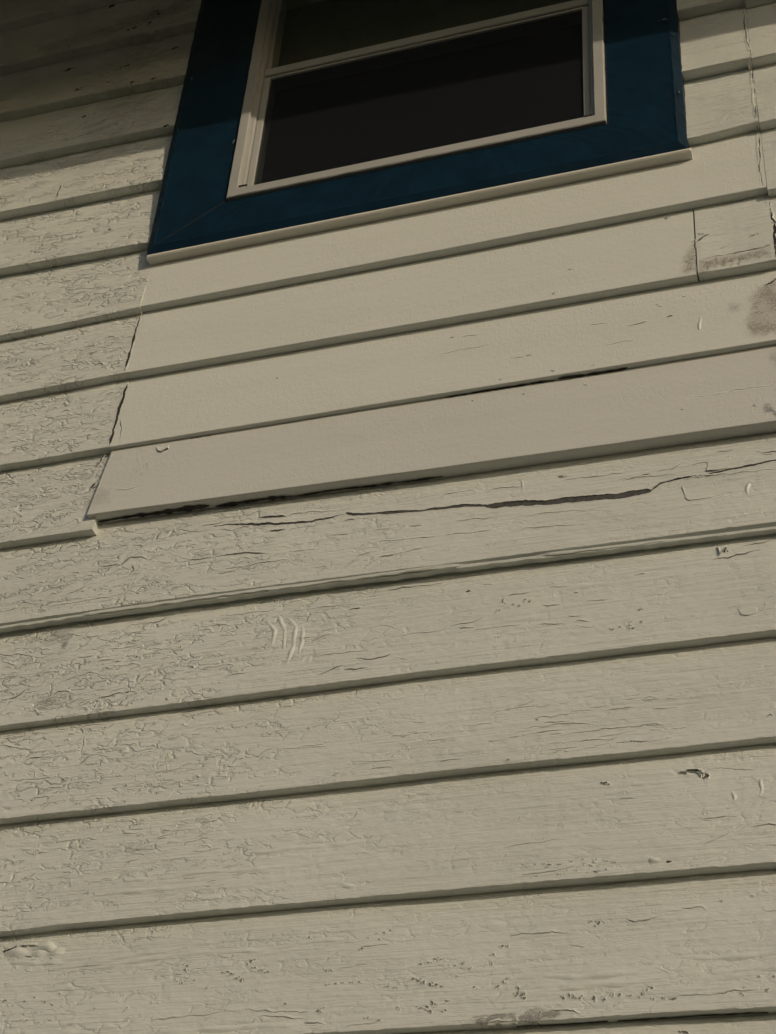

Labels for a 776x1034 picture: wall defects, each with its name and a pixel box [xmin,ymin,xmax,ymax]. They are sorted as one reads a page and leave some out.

crack [692,8,776,286]
crack [0,311,143,457]
crack [185,448,776,575]
crack [0,552,167,703]
crack [215,581,609,676]
crack [332,686,687,777]
peeling [678,769,711,780]
crack [6,812,253,913]
crack [703,798,776,847]
peeling [3,943,40,959]
peeling [410,956,473,1014]
peeling [464,976,678,1027]